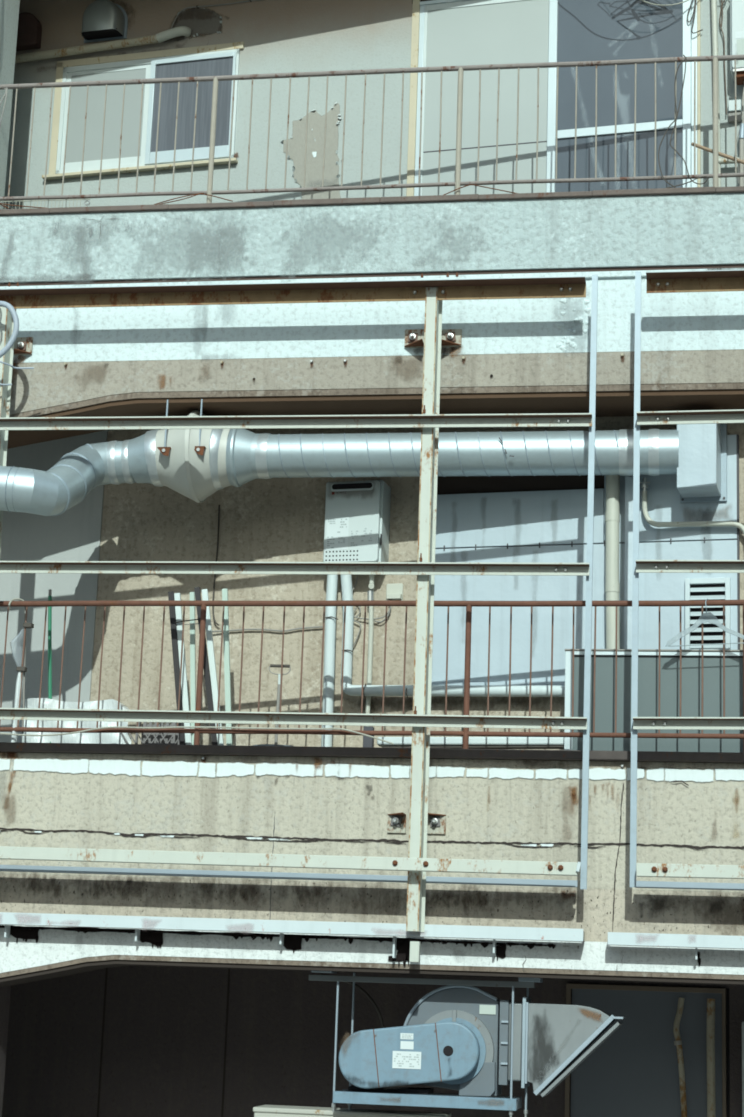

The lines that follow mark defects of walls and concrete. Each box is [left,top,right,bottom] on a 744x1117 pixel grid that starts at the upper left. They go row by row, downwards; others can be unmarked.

peeling [281,102,342,200]
crack [0,783,744,932]